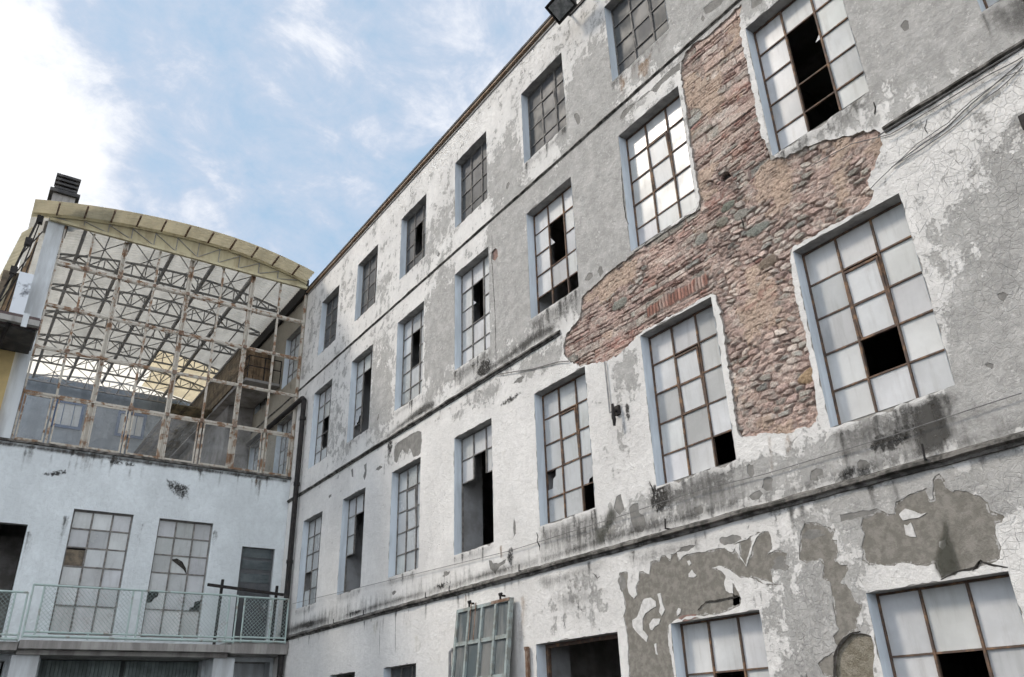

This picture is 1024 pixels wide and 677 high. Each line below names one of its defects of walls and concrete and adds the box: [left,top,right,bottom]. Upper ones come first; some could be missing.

flaking render [563,0,883,437]
crack [883,120,1024,332]
peeling [394,431,422,463]
damp [838,466,872,490]
damp [863,394,951,454]
damp [543,484,731,553]
peeling [614,474,1004,677]